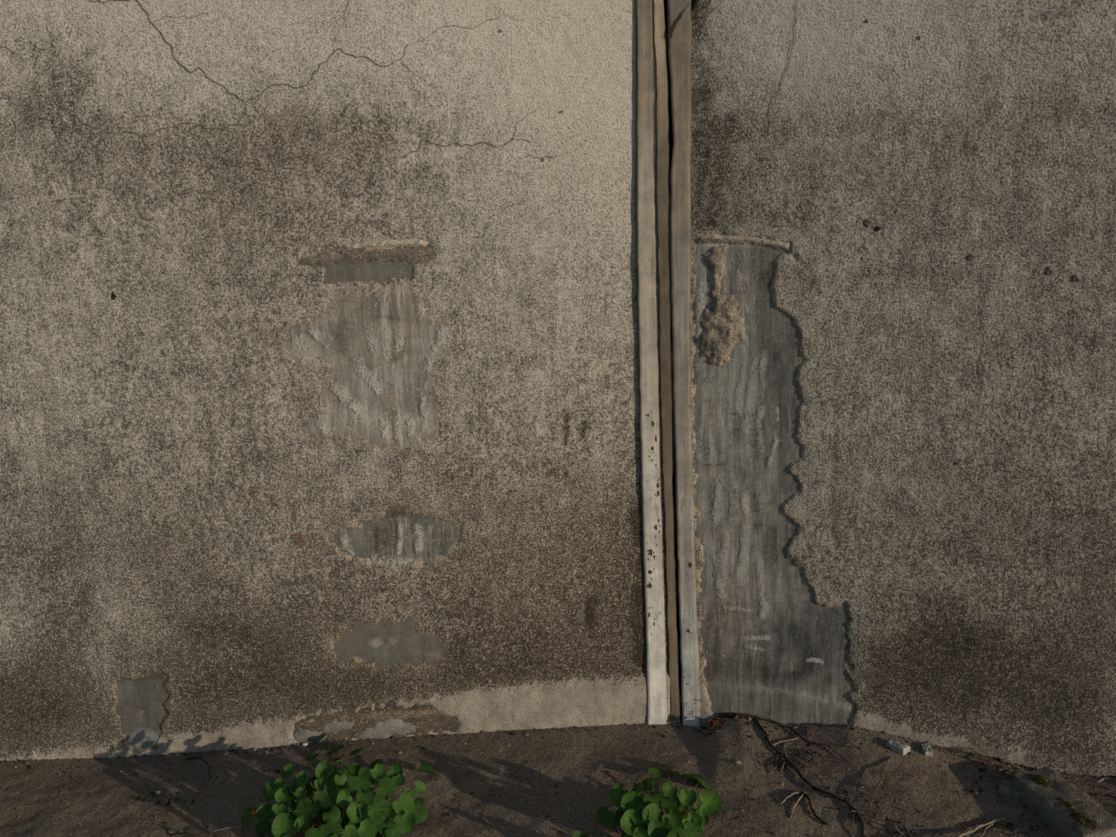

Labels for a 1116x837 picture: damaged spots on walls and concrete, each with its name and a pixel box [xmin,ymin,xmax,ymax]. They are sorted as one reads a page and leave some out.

crack [90,0,523,137]
crack [668,0,696,38]
crack [769,1,797,133]
crack [385,108,563,160]
spalling [283,239,450,453]
spalling [694,244,745,366]
spalling [329,507,462,568]